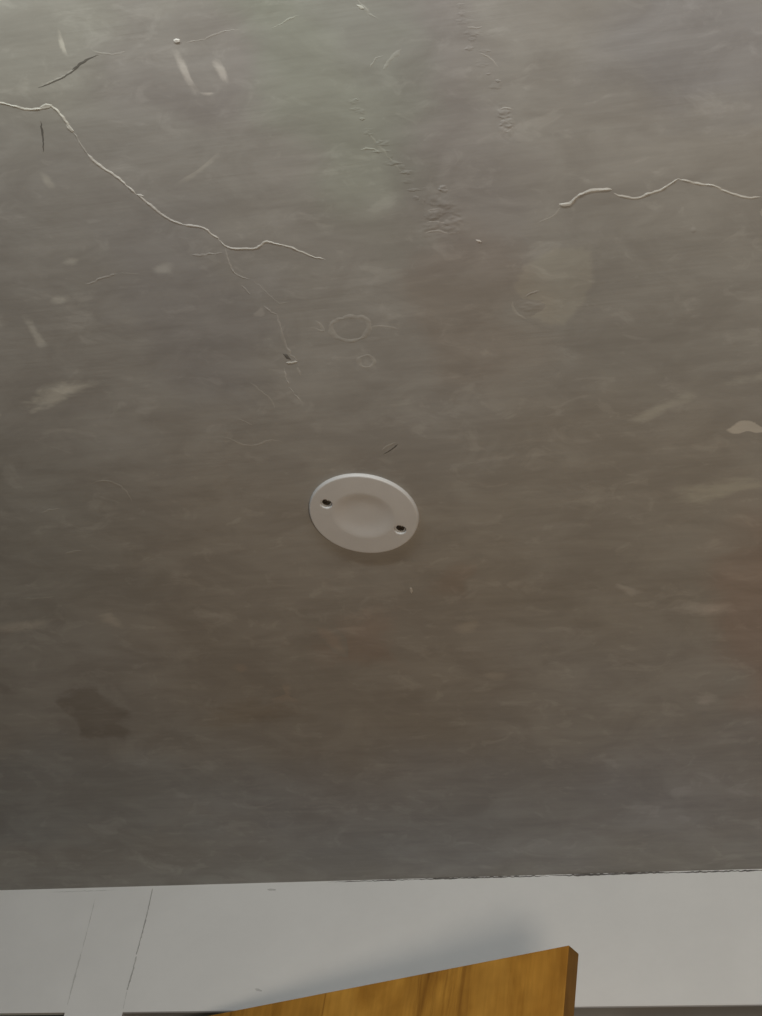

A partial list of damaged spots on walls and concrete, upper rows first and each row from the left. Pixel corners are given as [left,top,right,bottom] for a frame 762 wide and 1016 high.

crack [173,29,241,43]
crack [0,49,323,280]
crack [538,178,762,223]